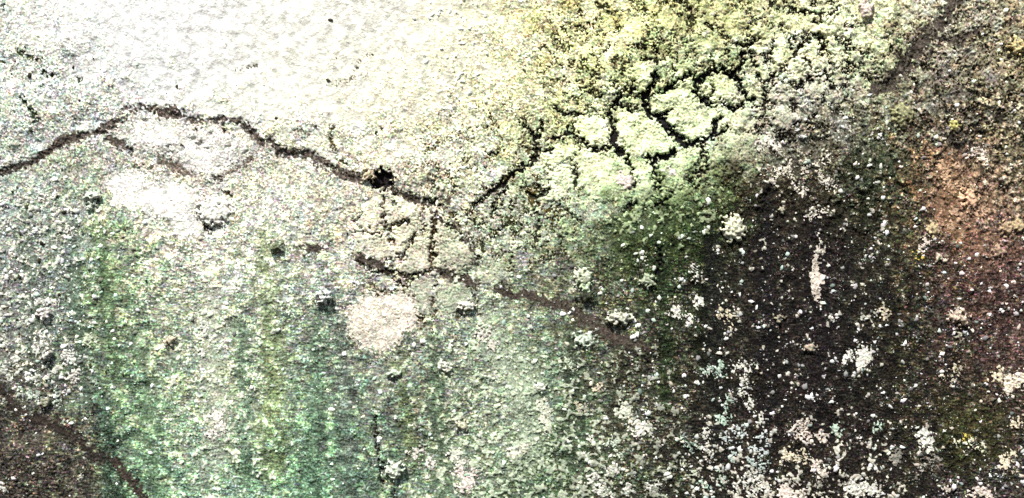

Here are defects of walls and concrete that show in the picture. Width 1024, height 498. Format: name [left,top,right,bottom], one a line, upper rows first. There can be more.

water stain [189,267,243,484]
water stain [297,242,329,254]
water stain [330,312,362,498]
water stain [355,253,395,277]
crack [0,0,840,322]
water stain [432,264,480,288]
water stain [461,302,591,498]
water stain [602,342,635,466]
water stain [646,142,937,498]